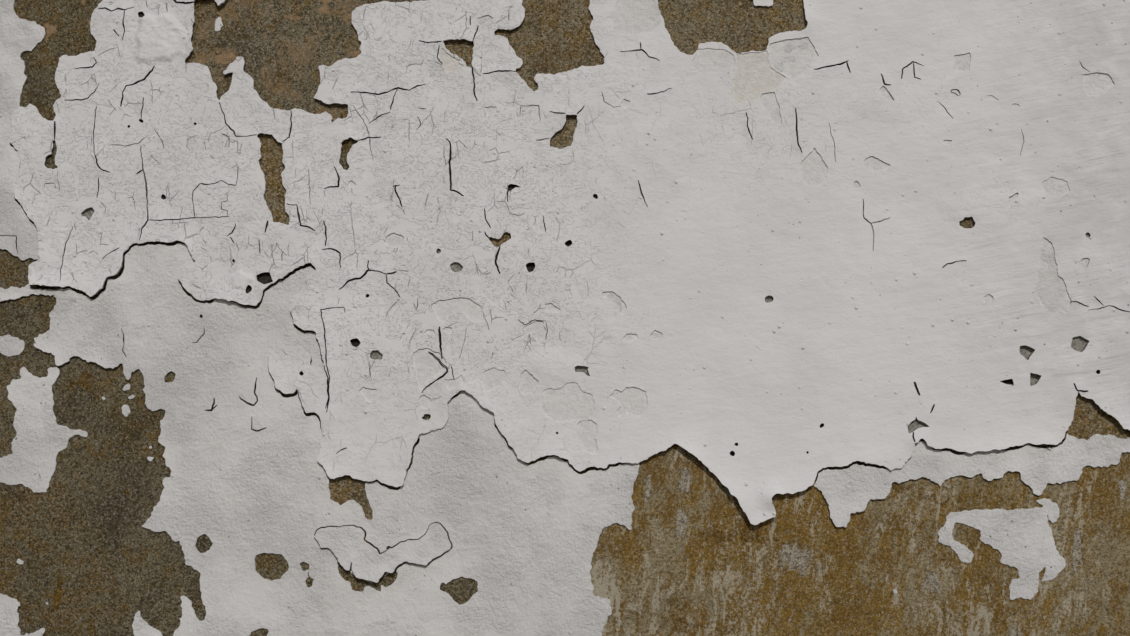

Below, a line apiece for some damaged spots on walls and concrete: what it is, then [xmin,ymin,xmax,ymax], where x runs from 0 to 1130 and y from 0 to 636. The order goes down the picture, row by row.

peeling [14,0,102,121]
peeling [185,0,425,122]
crack [351,40,442,157]
peeling [494,0,604,91]
peeling [658,0,818,121]
crack [54,58,418,412]
crack [446,138,509,274]
peeling [0,238,206,636]
crack [205,377,266,432]
crack [422,327,454,393]
peeling [493,370,1130,636]
damp [1072,530,1083,573]